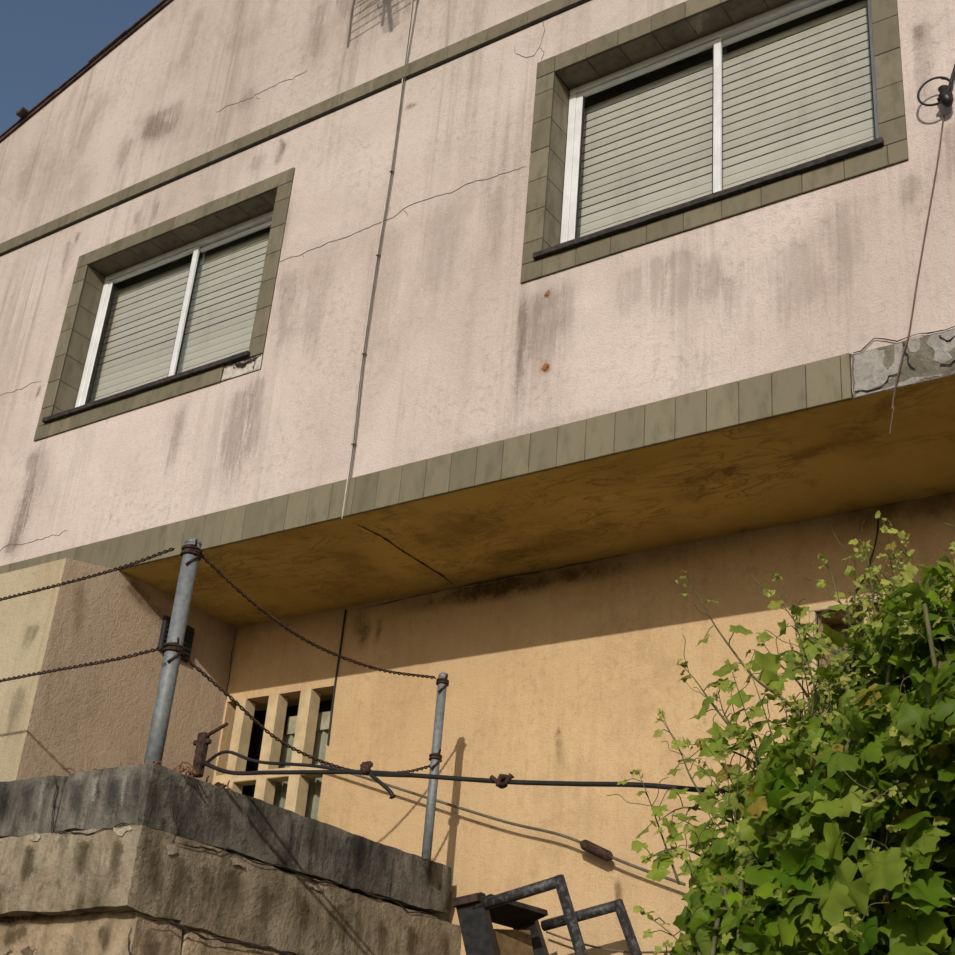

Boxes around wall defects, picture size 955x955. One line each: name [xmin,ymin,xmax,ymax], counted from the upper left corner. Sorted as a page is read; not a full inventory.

crack [219,70,308,112]
crack [280,166,526,262]
peeling [849,326,955,399]